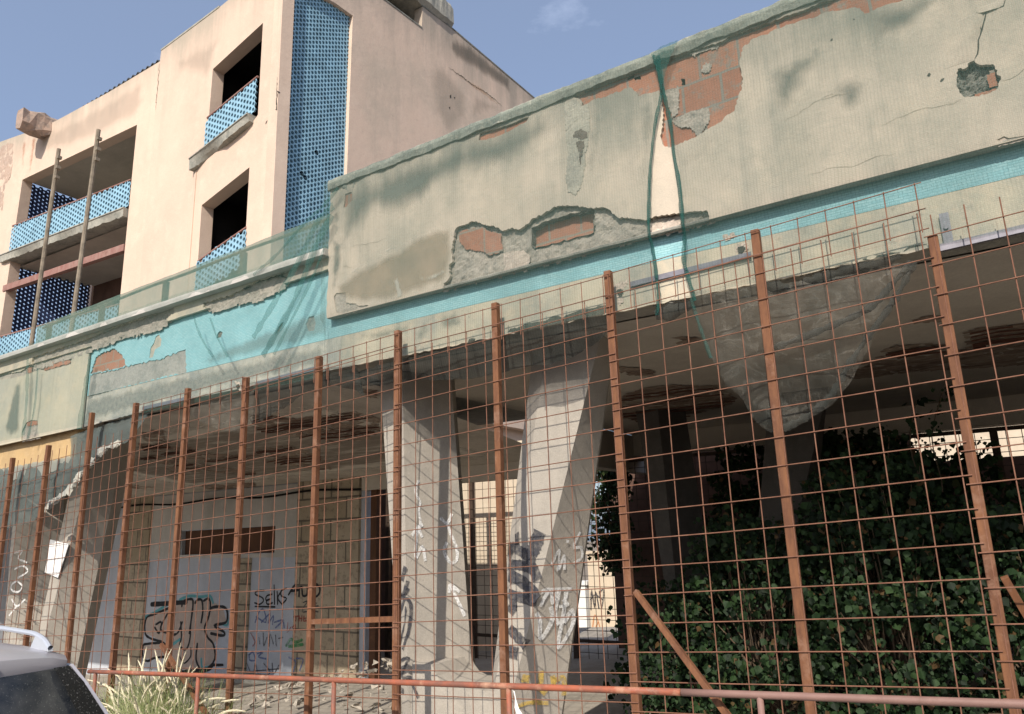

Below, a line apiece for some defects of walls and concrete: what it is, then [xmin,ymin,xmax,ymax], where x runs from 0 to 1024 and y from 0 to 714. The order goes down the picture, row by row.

crack [975,1,1005,58]
spalling [957,63,1001,97]
spalling [443,0,902,292]
spalling [205,271,292,313]
spalling [0,308,187,399]